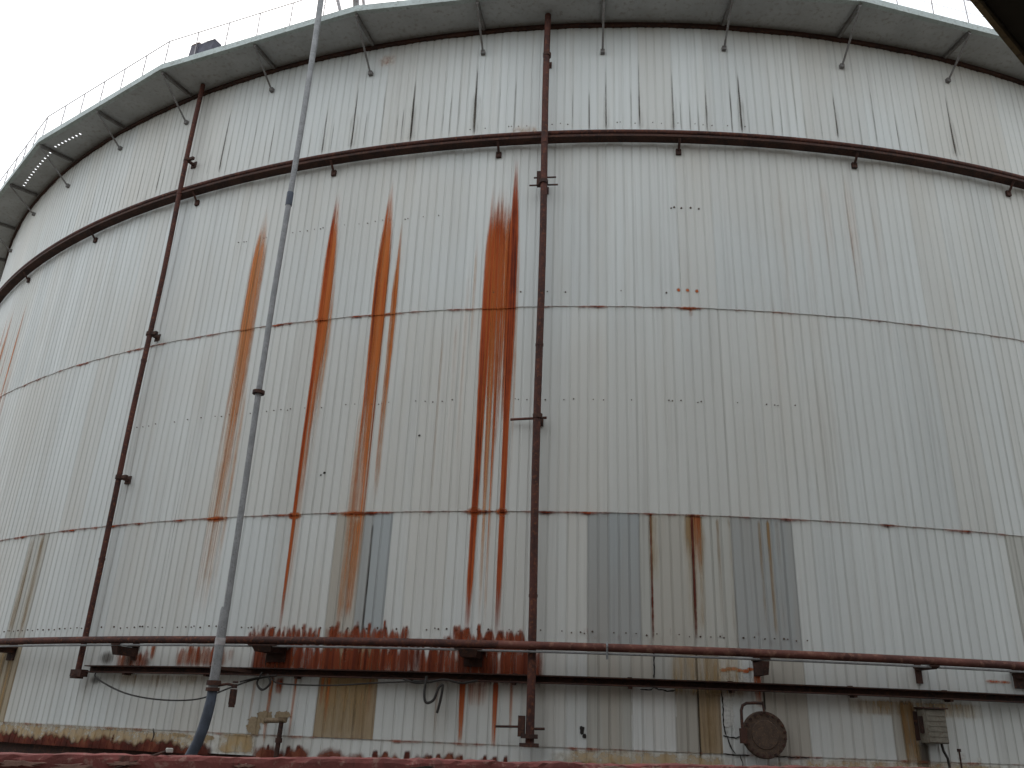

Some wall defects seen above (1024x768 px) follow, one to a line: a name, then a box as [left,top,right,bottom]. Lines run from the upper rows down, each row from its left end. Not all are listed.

corrosion [173,236,264,527]
corrosion [250,174,540,742]
corrosion [645,513,654,635]
corrosion [671,514,703,630]
corrosion [0,723,463,760]